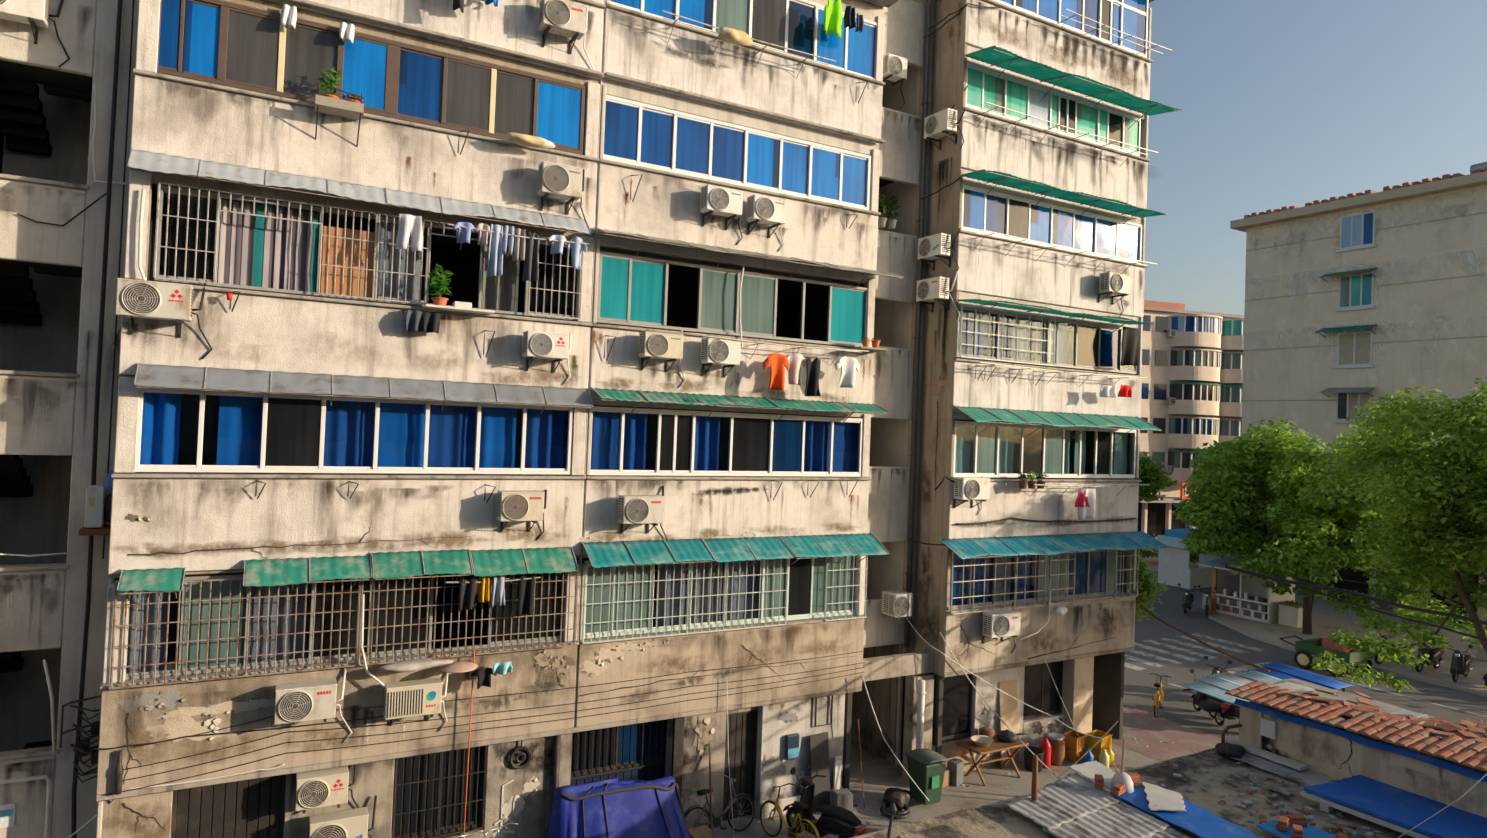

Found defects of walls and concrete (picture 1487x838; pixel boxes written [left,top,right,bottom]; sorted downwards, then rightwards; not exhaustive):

damp [667,48,725,67]
damp [993,10,1147,84]
damp [975,117,1144,175]
peeling [115,689,275,743]